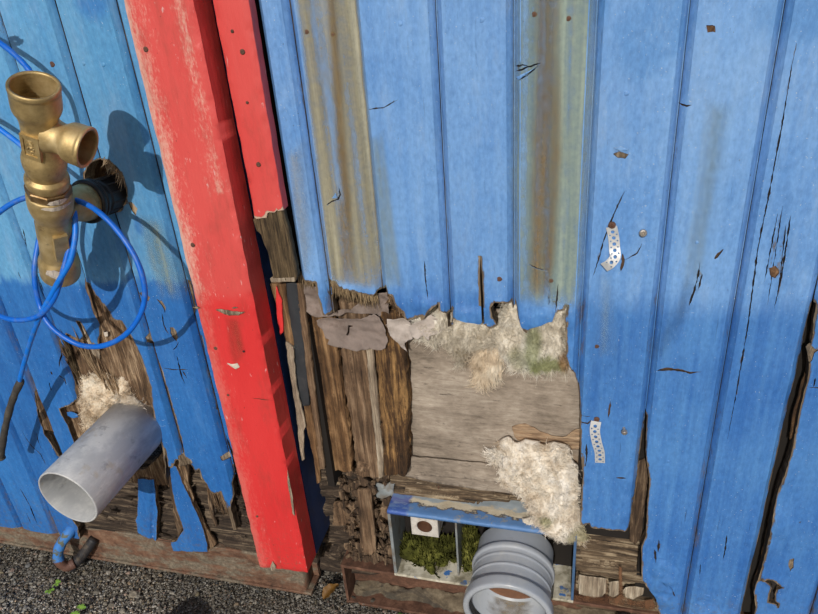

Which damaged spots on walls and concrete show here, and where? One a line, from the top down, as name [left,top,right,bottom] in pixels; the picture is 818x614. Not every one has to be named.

crack [594,196,622,272]
crack [734,101,789,401]
peeling [216,307,244,316]
peeling [160,365,193,466]
peeling [287,470,295,516]
corrosion [501,599,525,614]